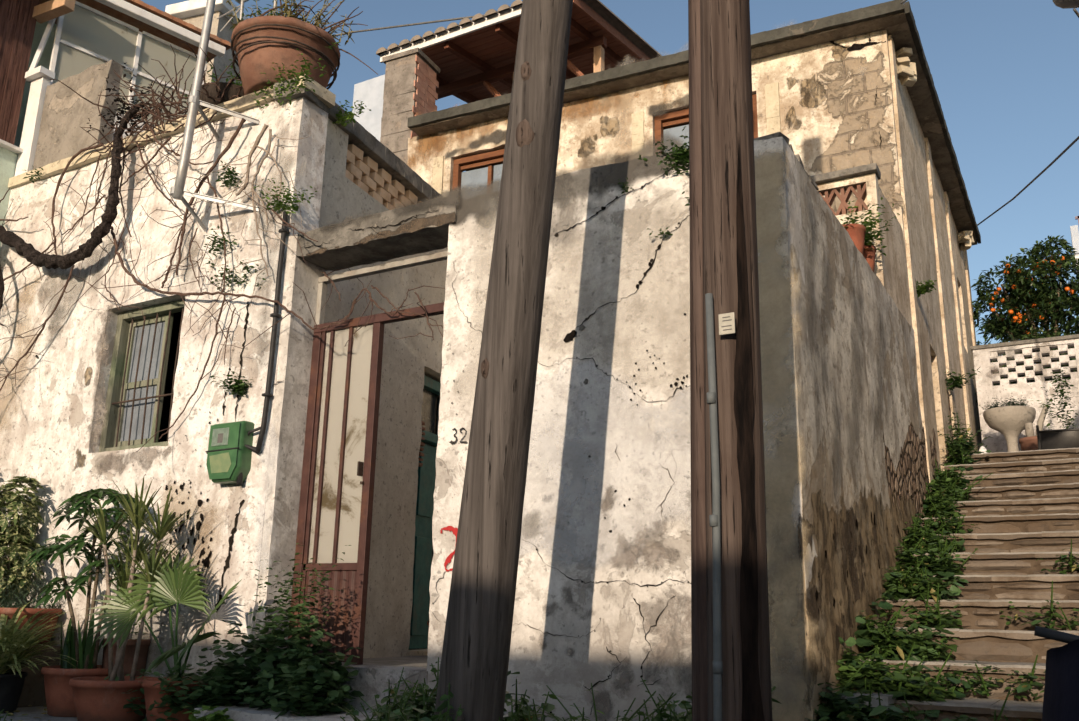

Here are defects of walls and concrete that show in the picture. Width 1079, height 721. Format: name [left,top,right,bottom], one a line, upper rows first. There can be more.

crack [829,34,886,48]
flaking render [785,42,905,213]
crack [554,164,677,237]
crack [575,215,690,330]
crack [541,357,689,402]
crack [215,499,244,613]
crack [513,539,691,715]
flaking render [797,488,917,710]